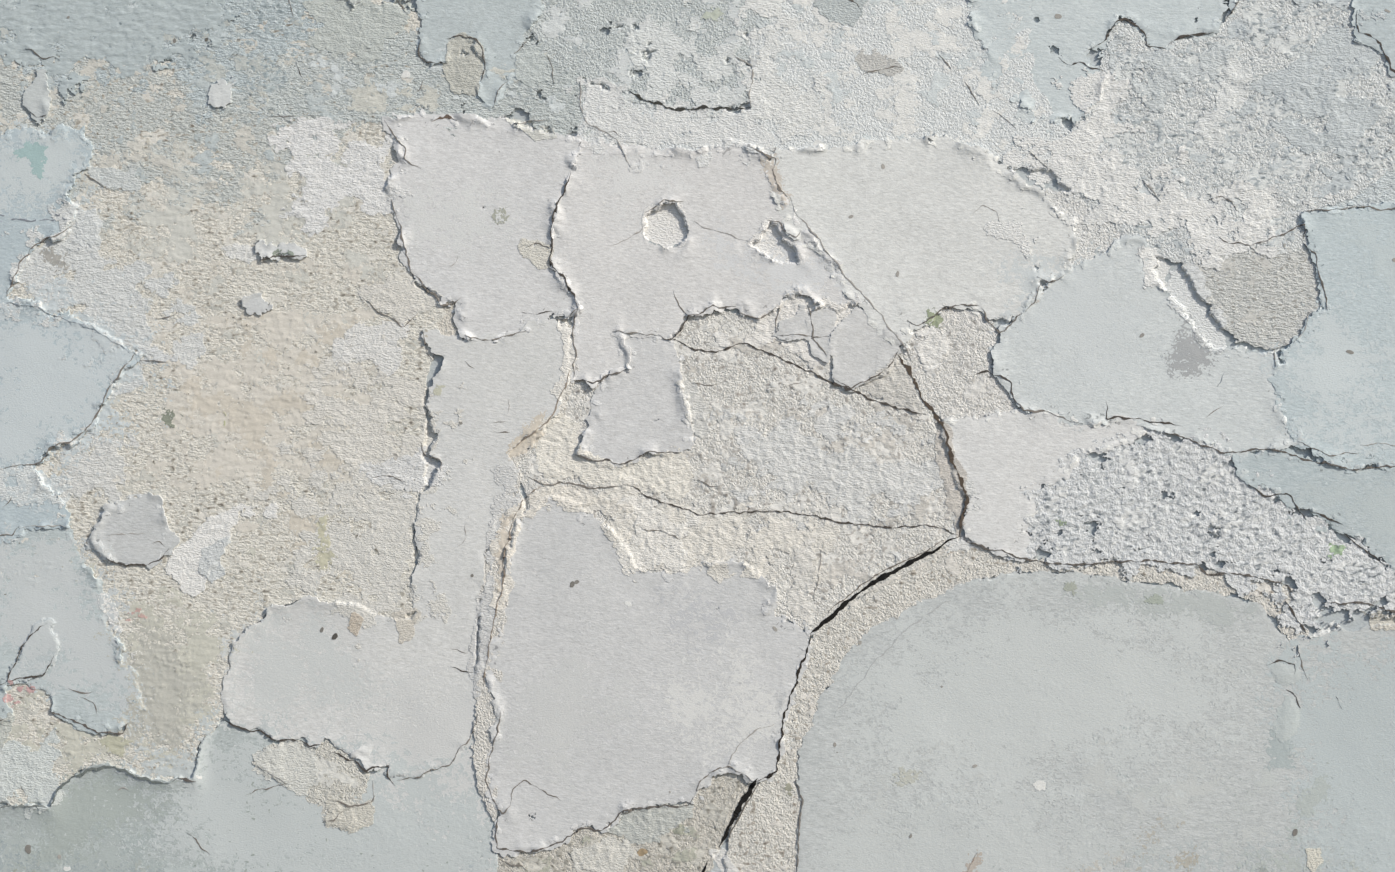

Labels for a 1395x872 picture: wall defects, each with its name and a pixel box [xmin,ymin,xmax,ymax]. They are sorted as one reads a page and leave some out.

crack [392,203,459,306]
peeling [0,0,1097,808]
crack [454,146,969,872]
spalling [399,292,1395,872]
crack [977,370,1071,422]
crack [1106,375,1224,426]
peeling [1022,0,1395,358]
peeling [252,740,370,834]